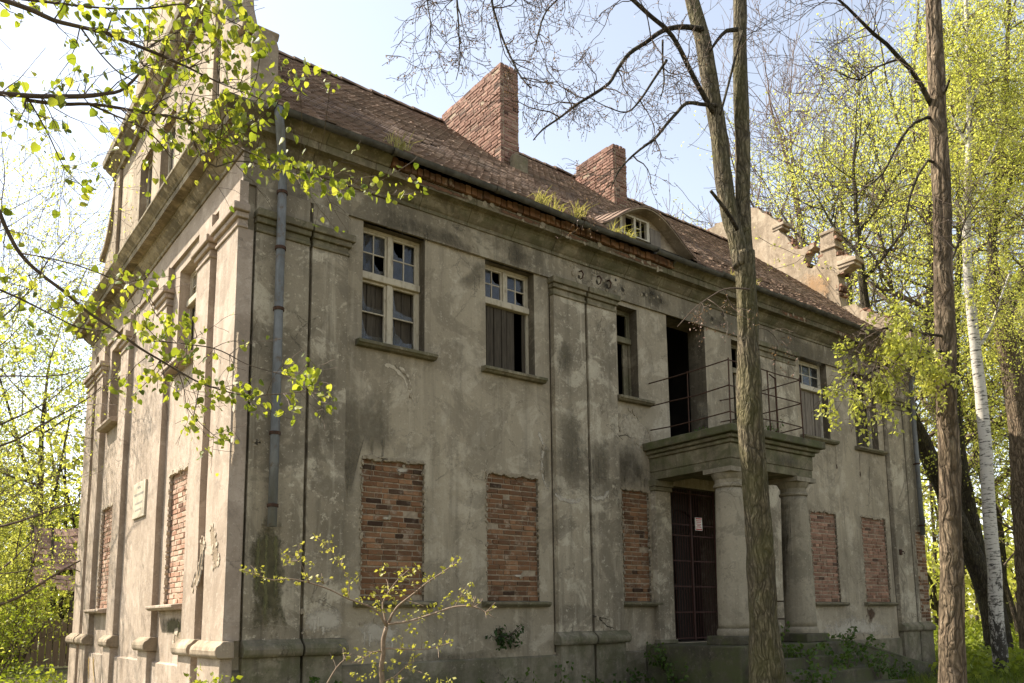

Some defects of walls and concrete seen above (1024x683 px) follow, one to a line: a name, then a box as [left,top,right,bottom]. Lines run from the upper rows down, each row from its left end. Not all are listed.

damp [251,528,286,624]